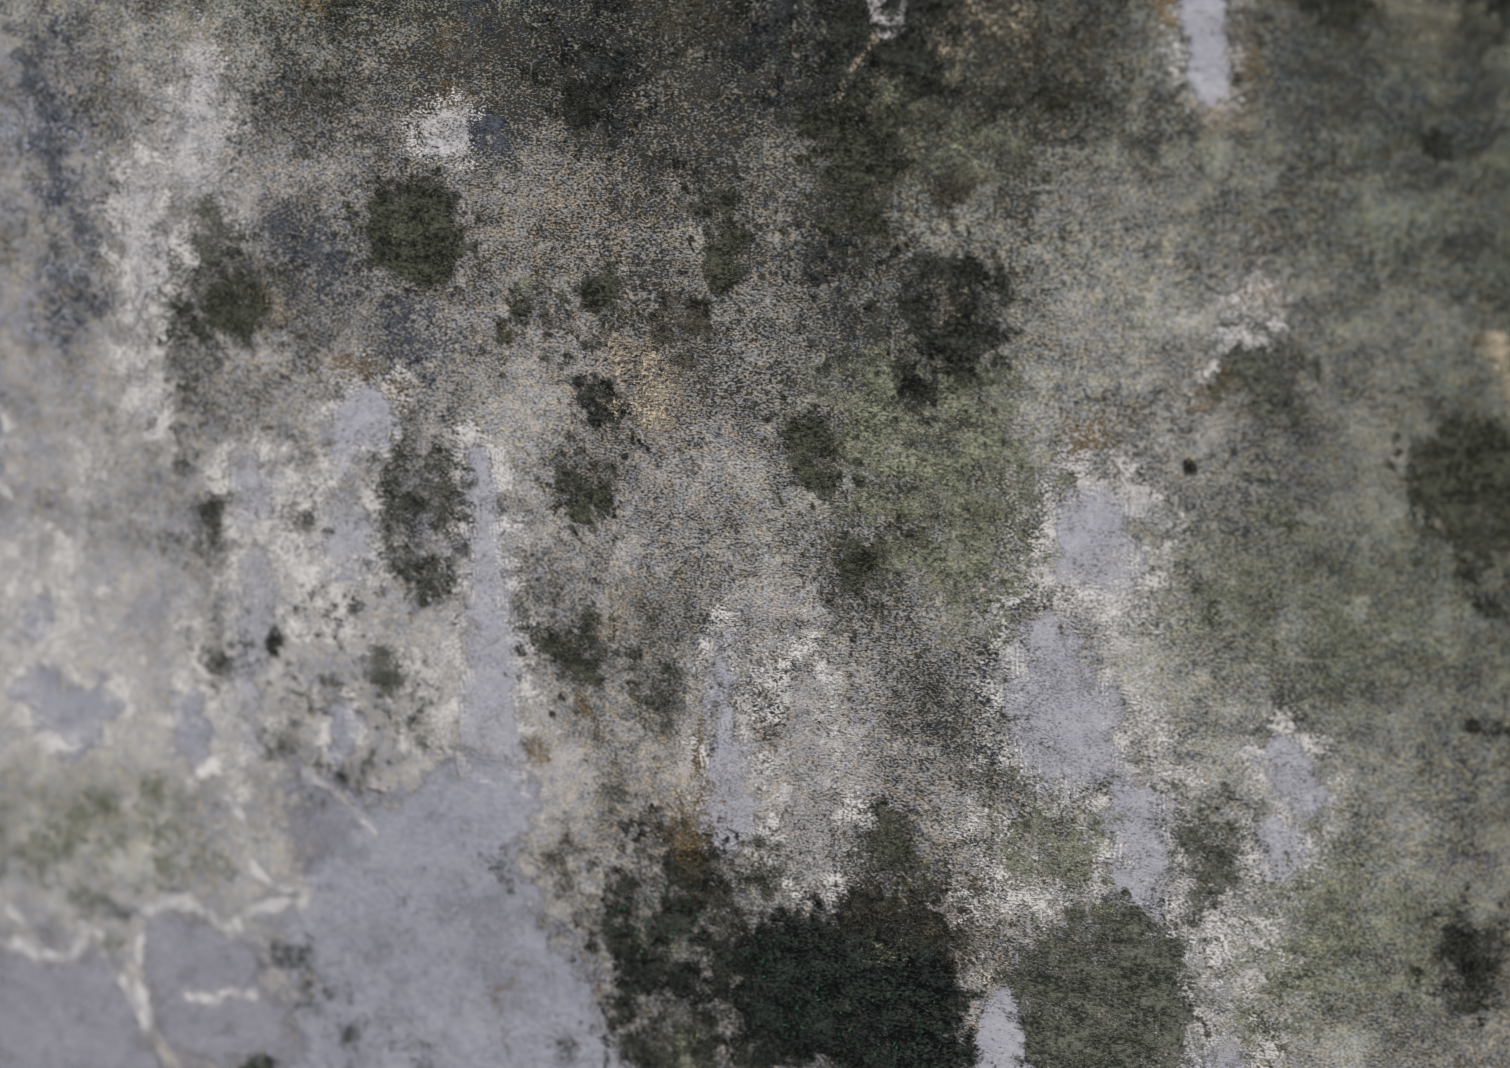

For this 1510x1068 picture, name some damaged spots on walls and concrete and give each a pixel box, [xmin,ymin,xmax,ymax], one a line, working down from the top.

water stain [330,0,1133,643]
water stain [0,0,487,1068]
water stain [1385,397,1510,651]
water stain [479,471,1290,1068]
water stain [1451,683,1510,760]
crack [0,894,40,952]
crack [117,931,259,1045]